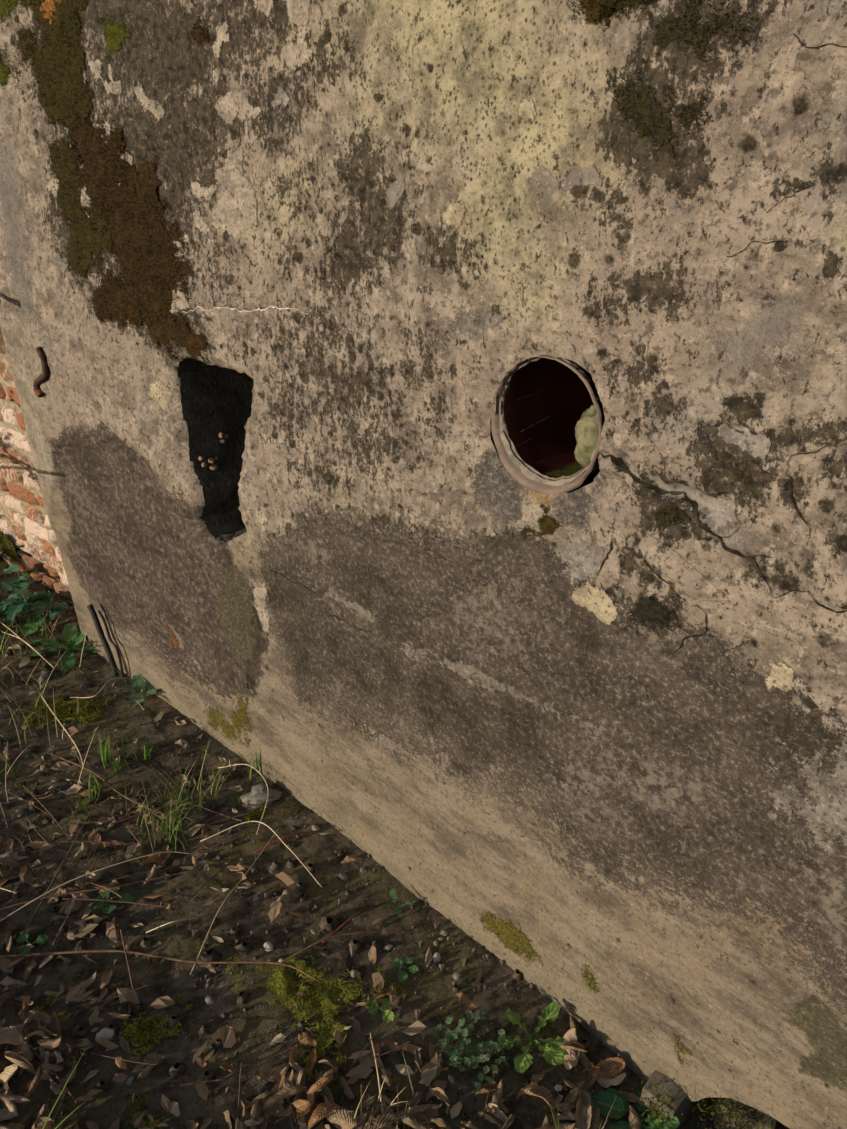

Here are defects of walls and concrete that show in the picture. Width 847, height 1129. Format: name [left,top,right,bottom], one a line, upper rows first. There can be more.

crack [594,538,749,672]
crack [598,453,847,613]
crack [752,436,836,536]
water stain [49,419,847,1034]